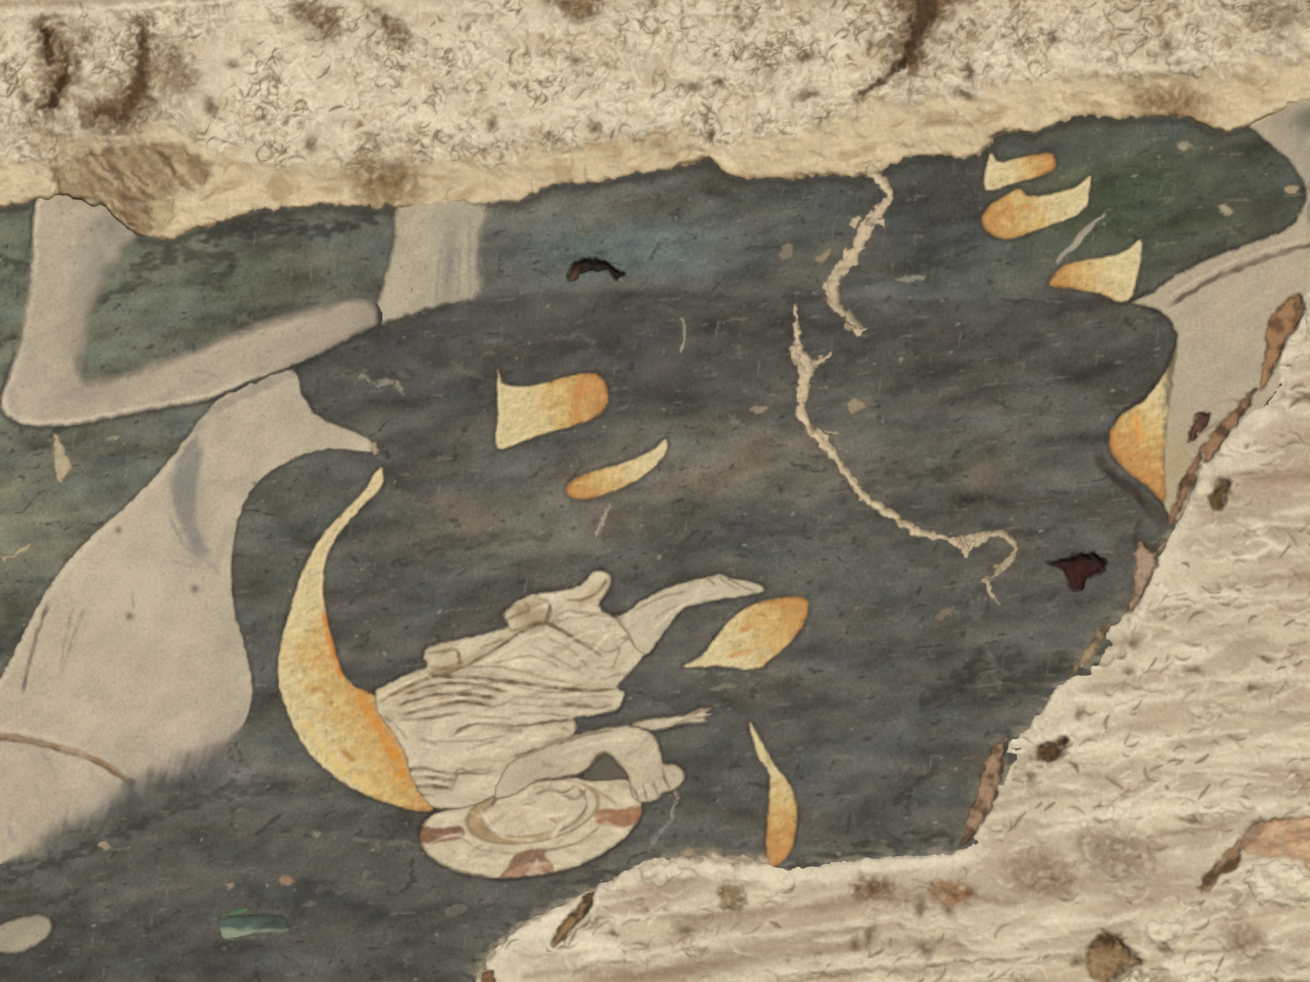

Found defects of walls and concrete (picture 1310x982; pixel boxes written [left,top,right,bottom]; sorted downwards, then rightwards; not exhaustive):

damp [49,65,68,108]
spalling [52,143,209,237]
peeling [896,275,925,283]
crack [790,164,1018,604]
spalling [1170,294,1305,524]
peeling [53,435,72,483]
spalling [1127,541,1166,613]
spalling [960,736,1008,847]
spalling [1199,816,1310,891]
peeling [218,908,288,939]
spalling [476,909,550,982]
spalling [552,889,595,946]